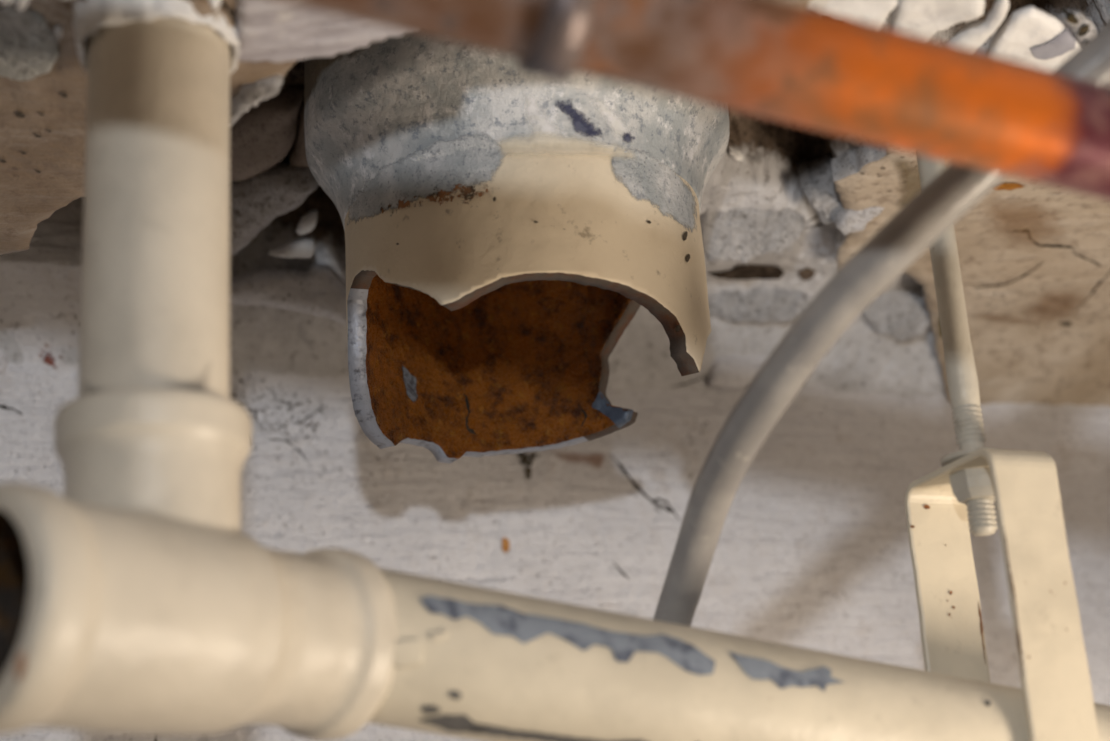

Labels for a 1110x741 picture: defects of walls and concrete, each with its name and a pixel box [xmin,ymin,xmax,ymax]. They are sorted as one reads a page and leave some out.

spalling [0,4,59,81]
peeling [230,0,412,127]
peeling [806,0,1097,71]
peeling [555,101,601,137]
peeling [268,209,317,258]
crack [974,229,1110,312]
crack [610,454,682,522]